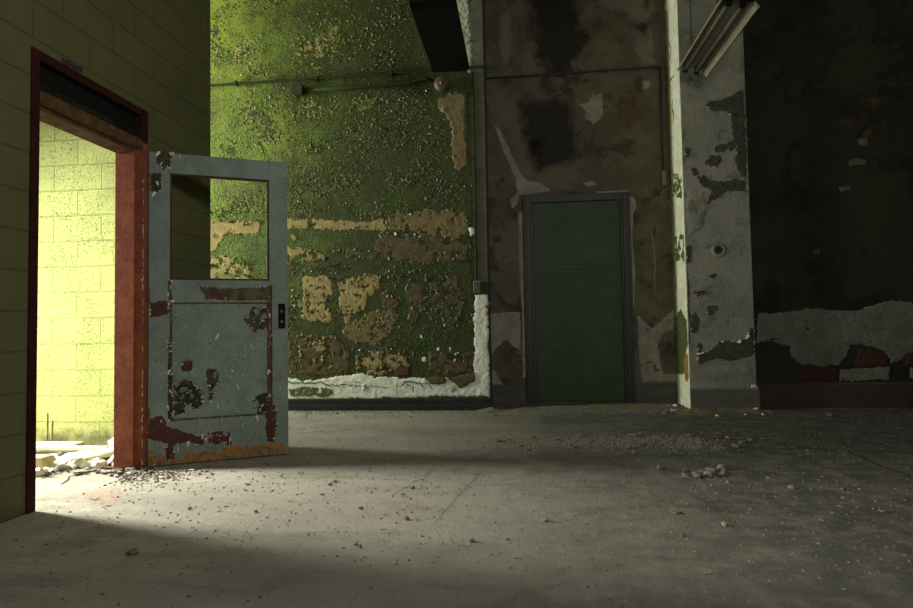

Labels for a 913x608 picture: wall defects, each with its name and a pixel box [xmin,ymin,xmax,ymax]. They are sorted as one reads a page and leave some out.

spalling [73,0,550,478]
spalling [579,92,603,124]
spalling [583,181,637,306]
spalling [637,10,913,383]